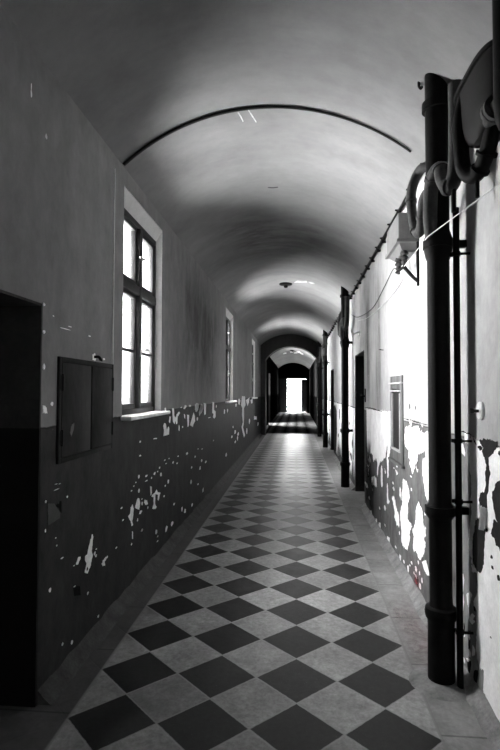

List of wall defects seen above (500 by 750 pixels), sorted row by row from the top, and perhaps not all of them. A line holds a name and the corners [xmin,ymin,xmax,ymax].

peeling [154,402,228,439]
peeling [231,396,259,443]
peeling [121,452,207,545]
peeling [365,408,429,589]
peeling [74,534,108,574]
peeling [455,432,500,722]